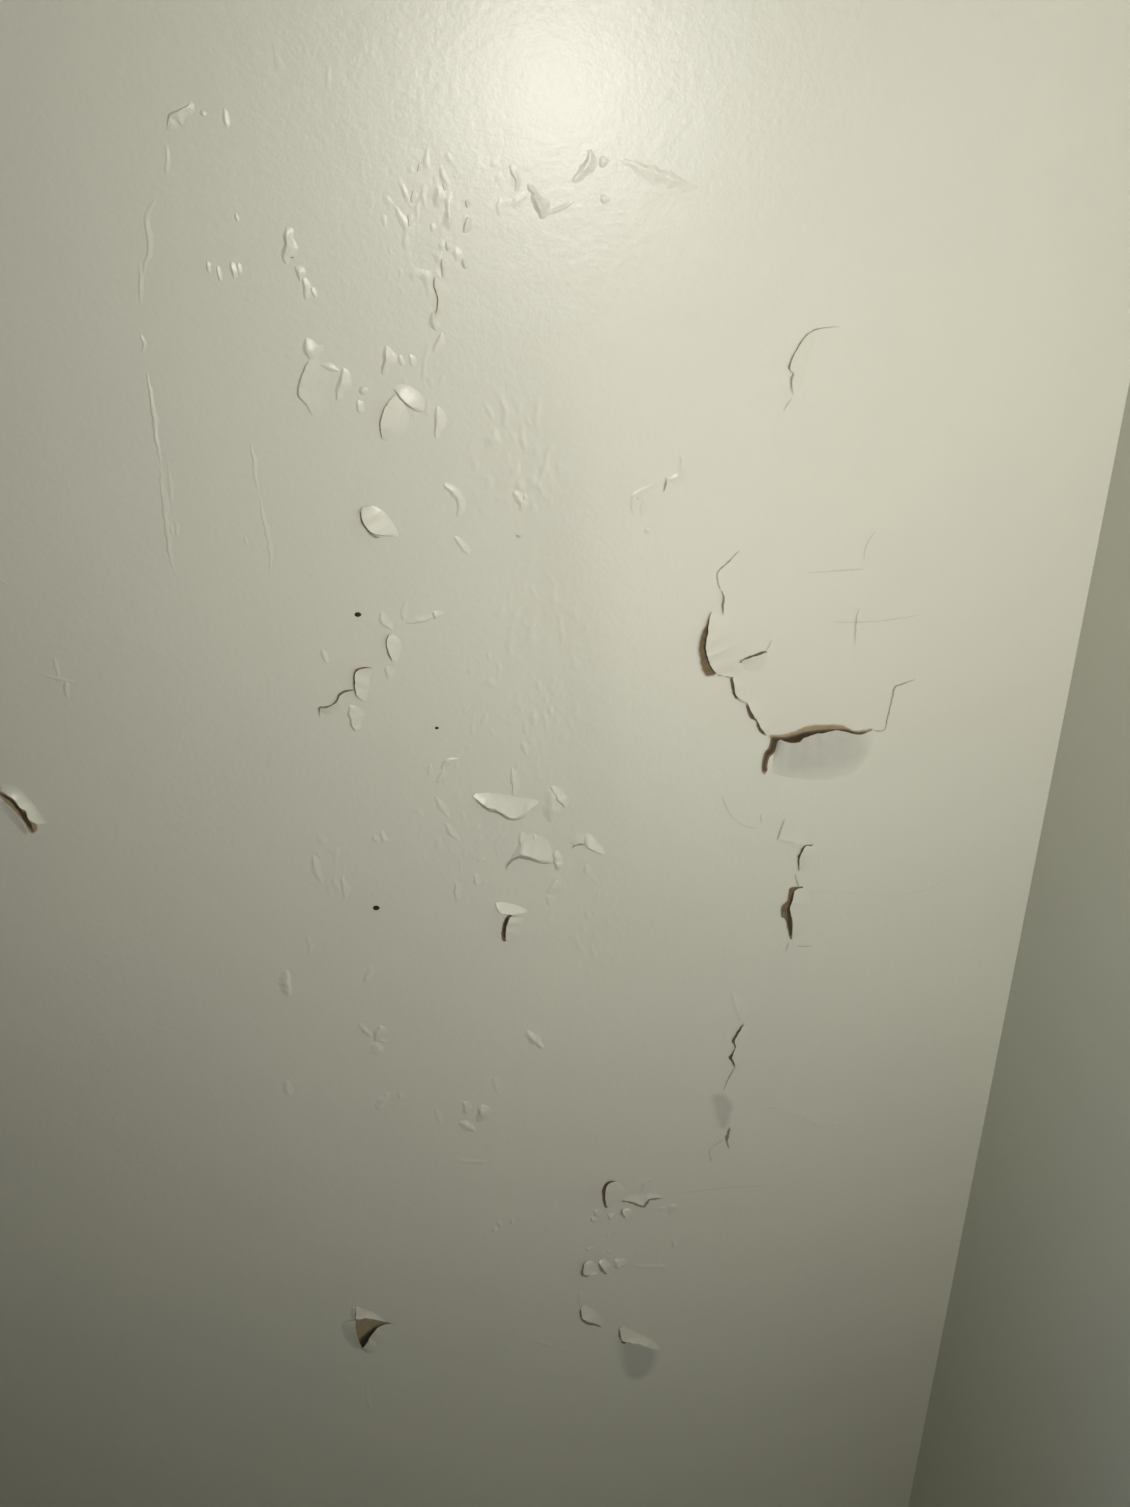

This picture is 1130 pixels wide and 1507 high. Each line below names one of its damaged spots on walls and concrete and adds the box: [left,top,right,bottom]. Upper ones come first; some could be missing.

peeling [296,258,470,442]
crack [783,326,839,411]
peeling [358,506,398,539]
peeling [318,601,445,732]
crack [697,550,922,780]
peeling [0,784,46,835]
peeling [496,902,528,943]
peeling [472,741,570,870]
crack [721,794,968,951]
crack [708,992,750,1162]
peeling [341,1306,395,1353]
peeling [577,1246,668,1382]